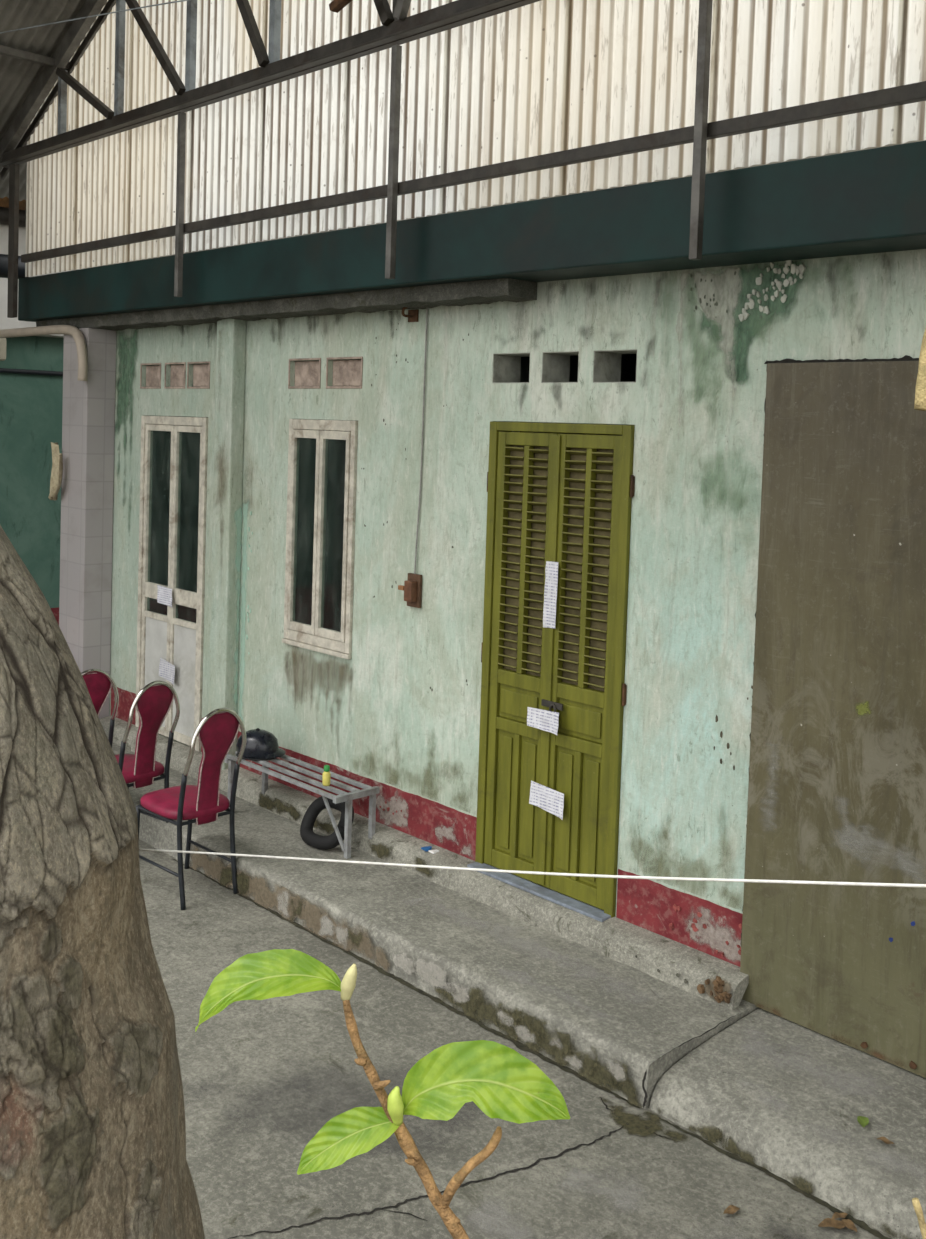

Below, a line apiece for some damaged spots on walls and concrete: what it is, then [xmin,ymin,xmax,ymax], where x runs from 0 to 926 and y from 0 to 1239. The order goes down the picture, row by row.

leakage [701,260,804,384]
leakage [293,649,347,697]
peeling [376,795,408,826]
peeling [435,826,471,856]
peeling [669,904,742,962]
leakage [466,988,484,1012]
leakage [498,1003,571,1057]
crack [228,1013,739,1239]